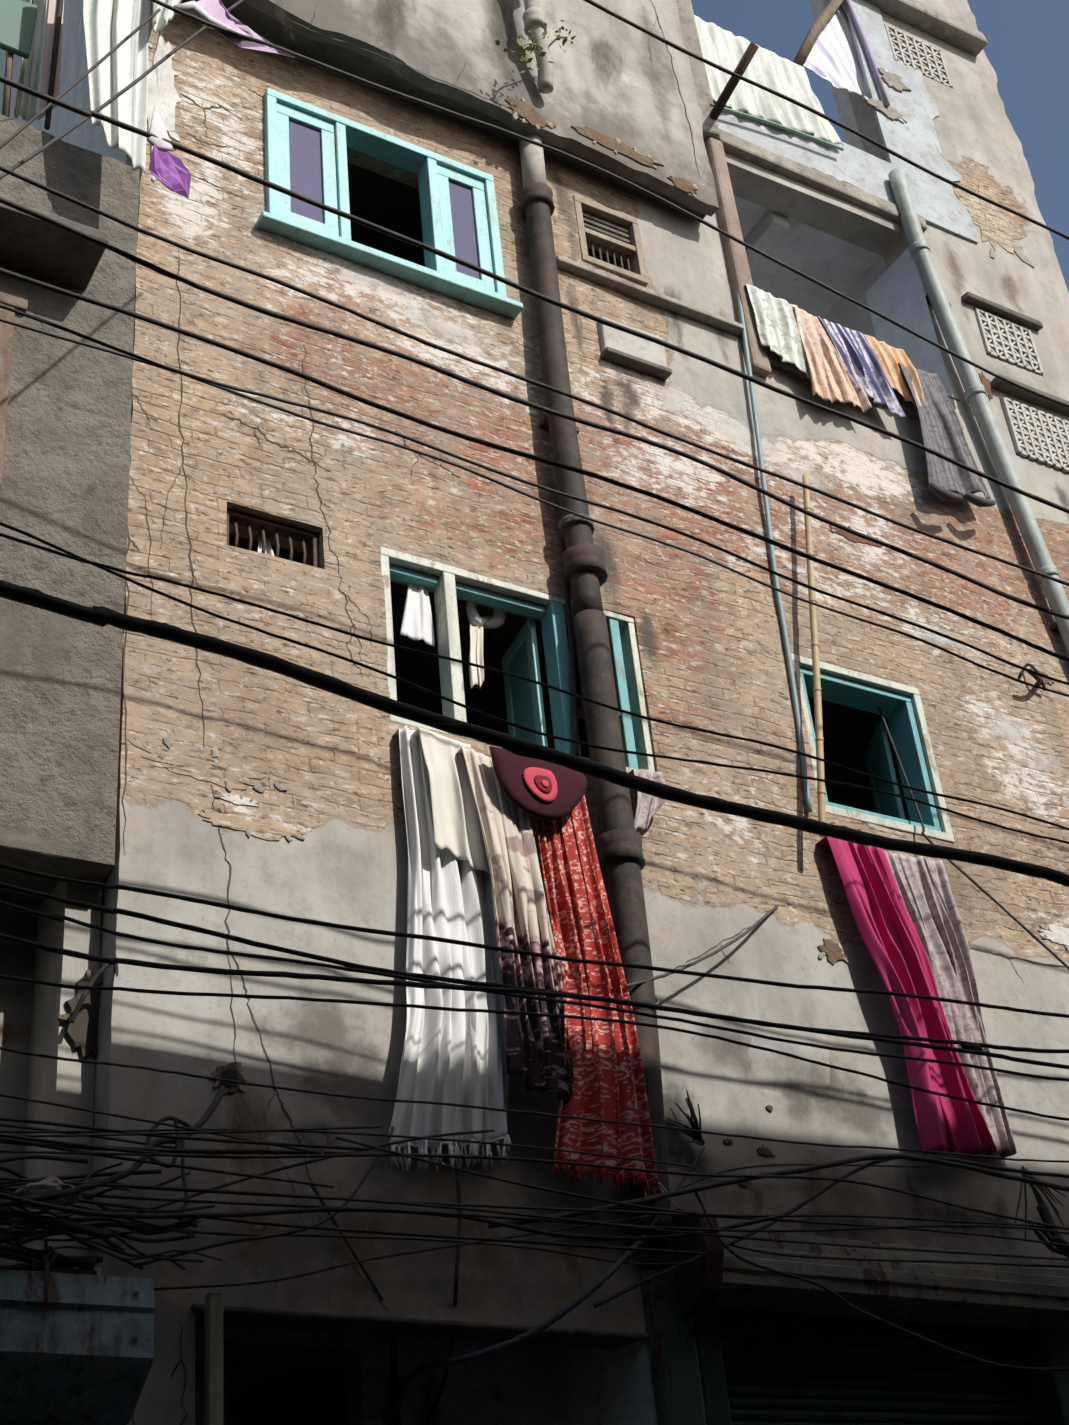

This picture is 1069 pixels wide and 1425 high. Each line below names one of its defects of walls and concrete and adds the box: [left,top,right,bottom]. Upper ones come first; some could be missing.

spalling [505,97,698,199]
flaking render [947,161,1035,268]
crack [122,260,205,855]
crack [223,346,373,678]
flaking render [126,737,305,843]
flaking render [817,939,849,966]
flaking render [1038,924,1069,950]
crack [211,784,361,1279]
crack [171,1321,188,1425]